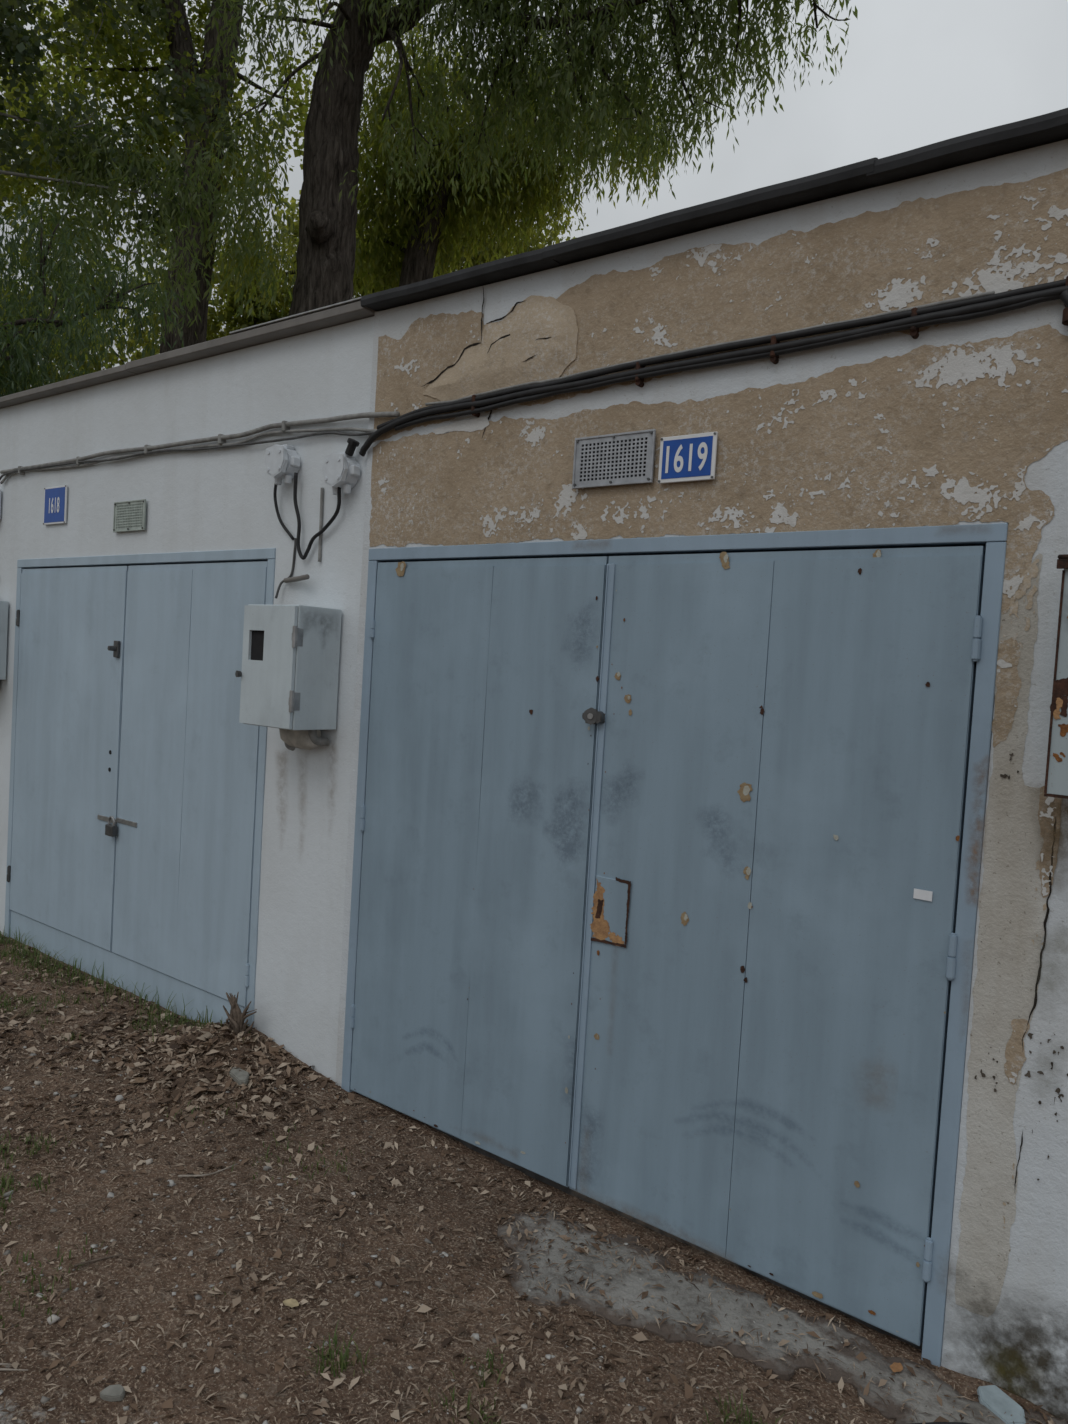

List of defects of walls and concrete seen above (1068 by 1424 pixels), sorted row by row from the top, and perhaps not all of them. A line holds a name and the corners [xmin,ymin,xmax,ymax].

crack [421,288,551,387]
peeling [369,168,1068,1318]
corrosion [590,877,631,948]
crack [1022,817,1056,1047]
crack [1015,1132,1023,1184]
mould [974,1310,1068,1420]